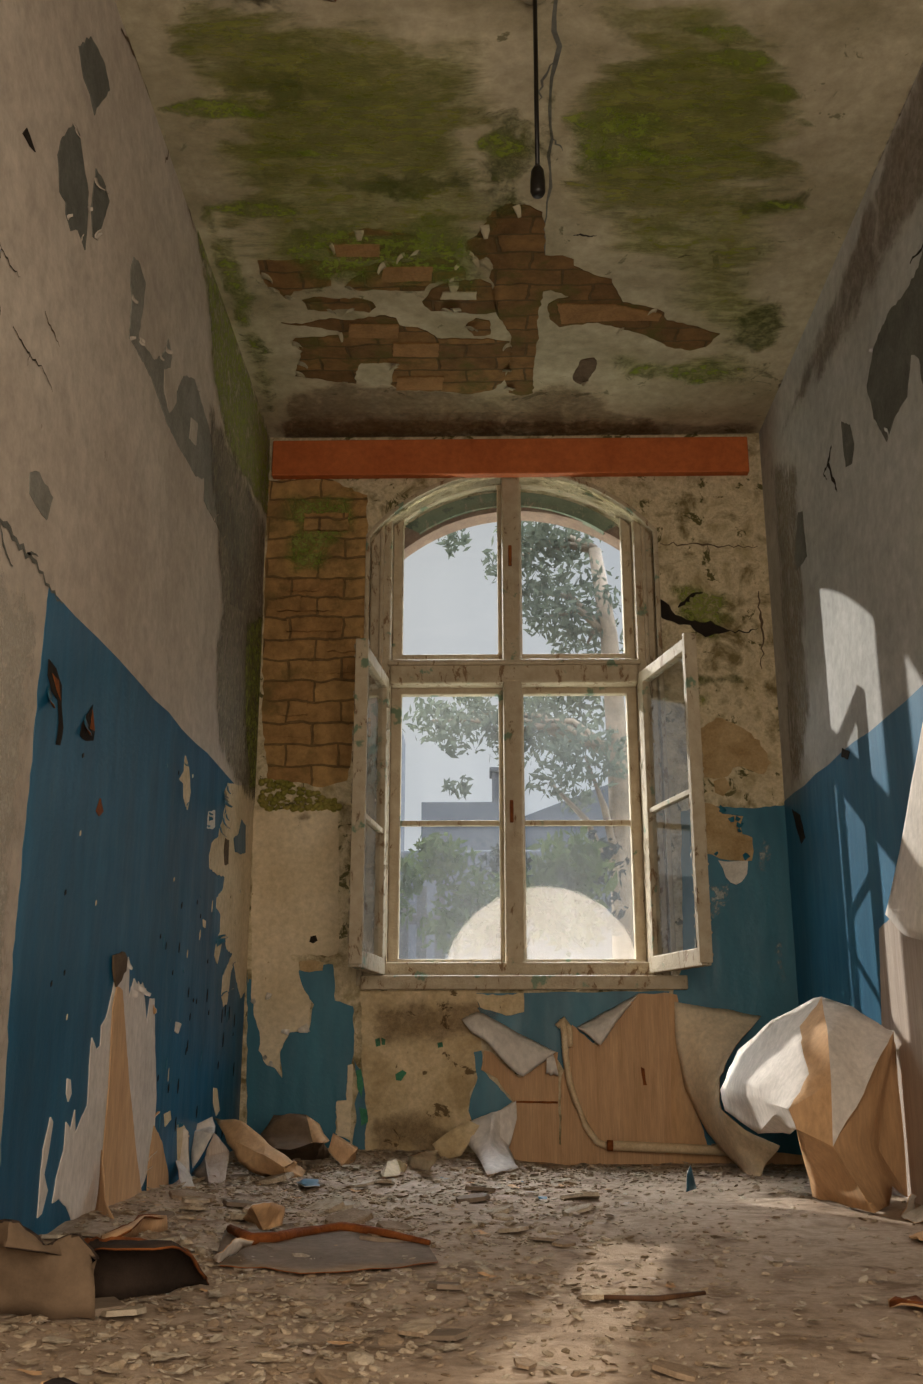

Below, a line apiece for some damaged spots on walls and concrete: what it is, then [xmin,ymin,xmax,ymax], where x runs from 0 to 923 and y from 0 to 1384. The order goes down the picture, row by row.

flaking render [78,36,110,116]
flaking render [57,122,110,250]
flaking render [258,203,720,396]
flaking render [867,251,923,442]
flaking render [129,257,243,611]
flaking render [841,421,854,467]
crack [0,519,63,605]
flaking render [127,479,390,1076]
flaking render [701,718,771,779]
peeling [688,799,754,885]
spalling [37,1117,53,1218]
spalling [154,1088,223,1161]